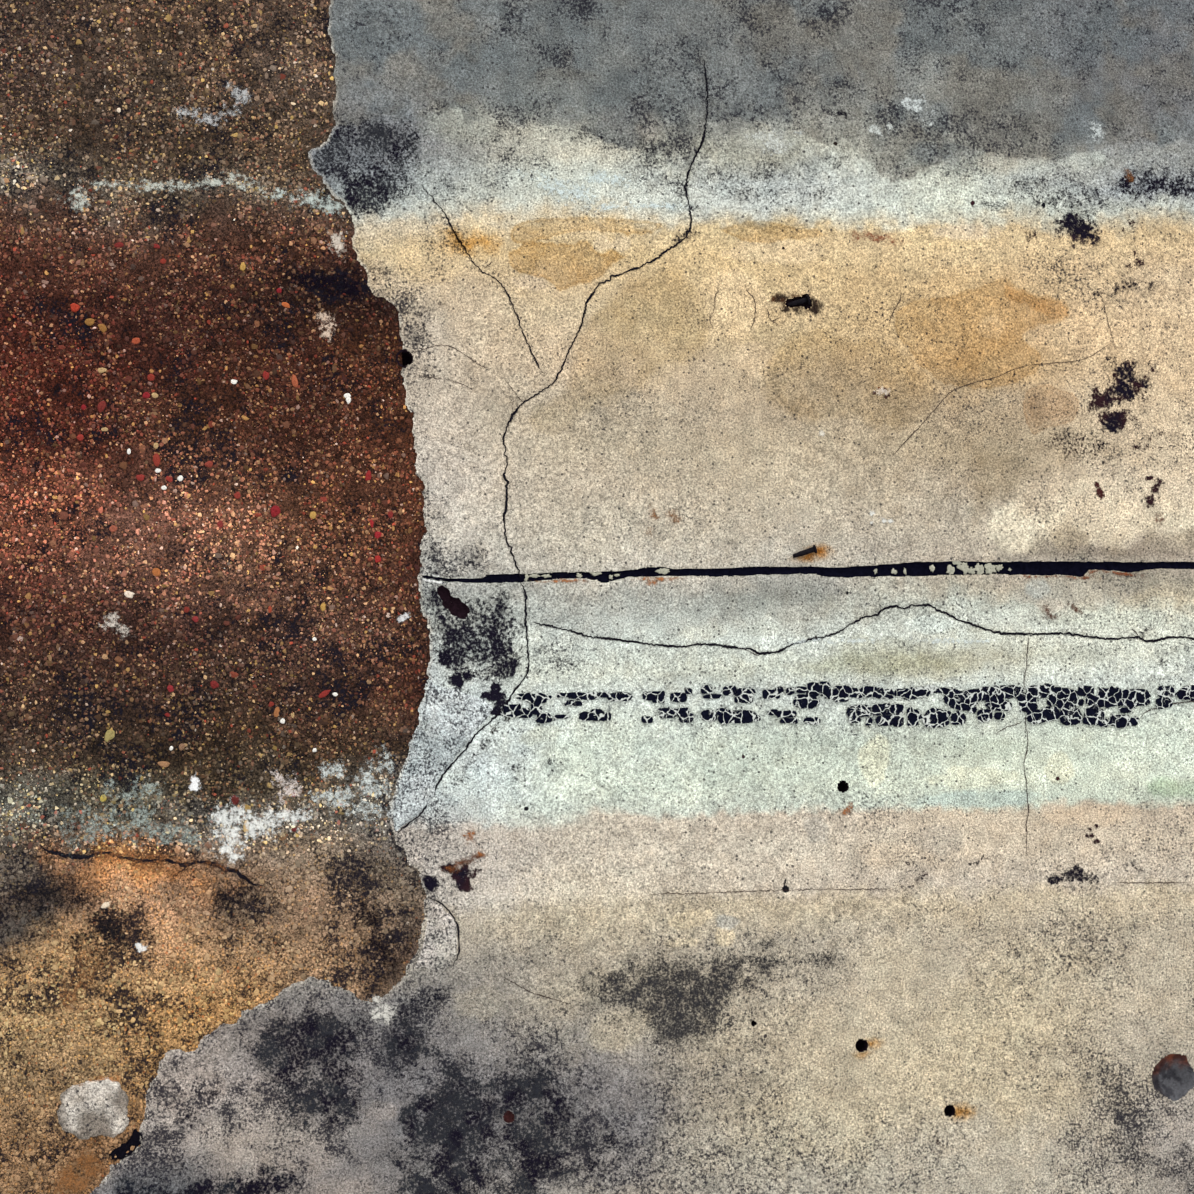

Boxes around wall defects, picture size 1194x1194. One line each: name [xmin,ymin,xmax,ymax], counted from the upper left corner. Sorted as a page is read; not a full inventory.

leakage [272,112,536,227]
leakage [979,165,1194,250]
corrosion [771,286,823,314]
crack [398,60,1194,848]
leakage [1043,350,1159,500]
spalling [0,0,458,1194]
spalling [437,585,470,619]
leakage [423,537,526,789]
leakage [233,898,638,1194]
leakage [567,933,844,1057]
spalling [1152,1054,1194,1101]
leakage [110,1162,345,1194]